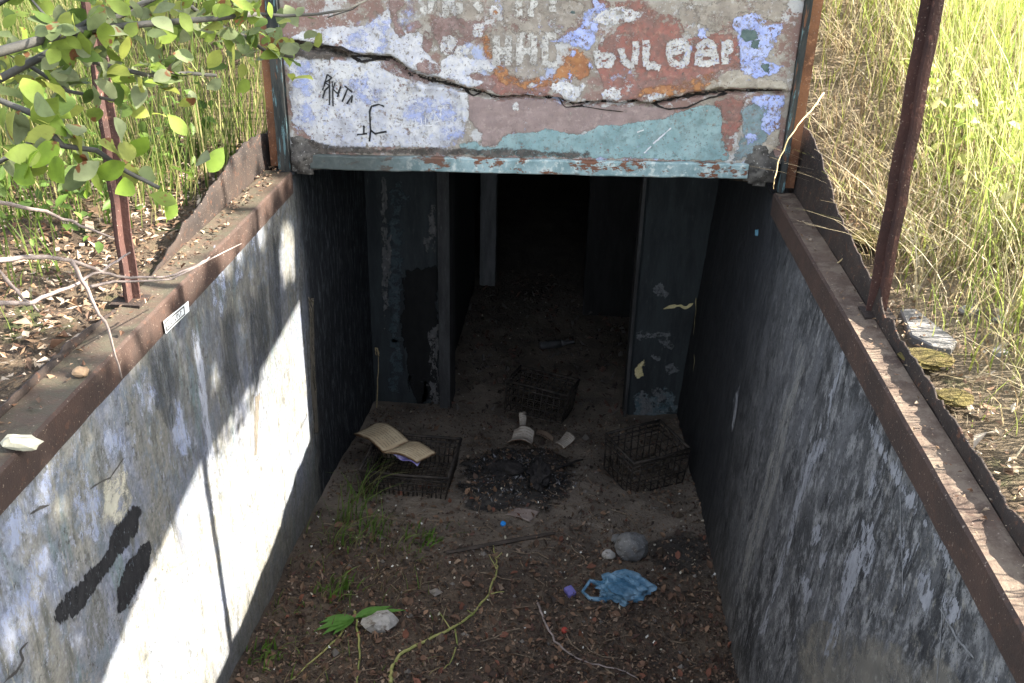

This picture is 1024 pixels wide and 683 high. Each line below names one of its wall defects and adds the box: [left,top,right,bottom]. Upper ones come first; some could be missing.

peeling [288,0,789,148]
crack [299,42,782,112]
peeling [633,387,678,416]
damp [738,346,806,597]
damp [758,351,845,636]
damp [799,619,959,683]